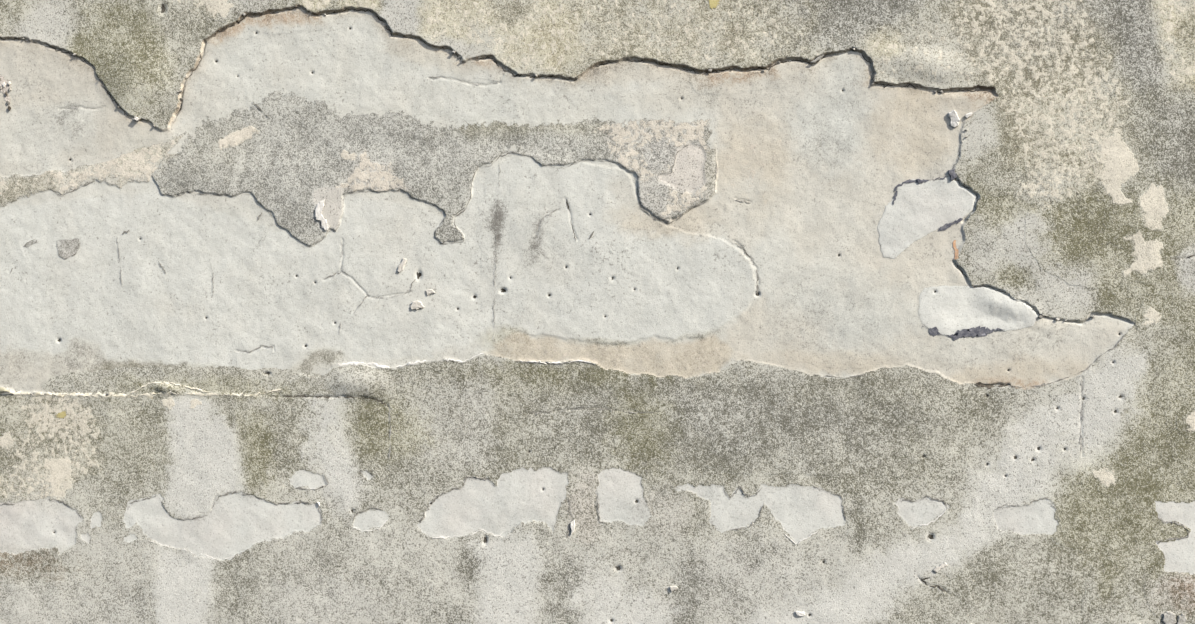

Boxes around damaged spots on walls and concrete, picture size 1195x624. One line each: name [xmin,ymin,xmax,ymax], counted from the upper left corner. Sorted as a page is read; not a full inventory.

peeling [0,4,1134,397]
peeling [0,496,102,555]
peeling [123,470,329,560]
peeling [351,507,389,532]
peeling [417,467,575,543]
peeling [595,468,651,526]
peeling [676,483,846,544]
peeling [894,495,950,539]
peeling [992,497,1060,535]
peeling [1155,501,1195,575]
flaking render [1162,611,1187,624]